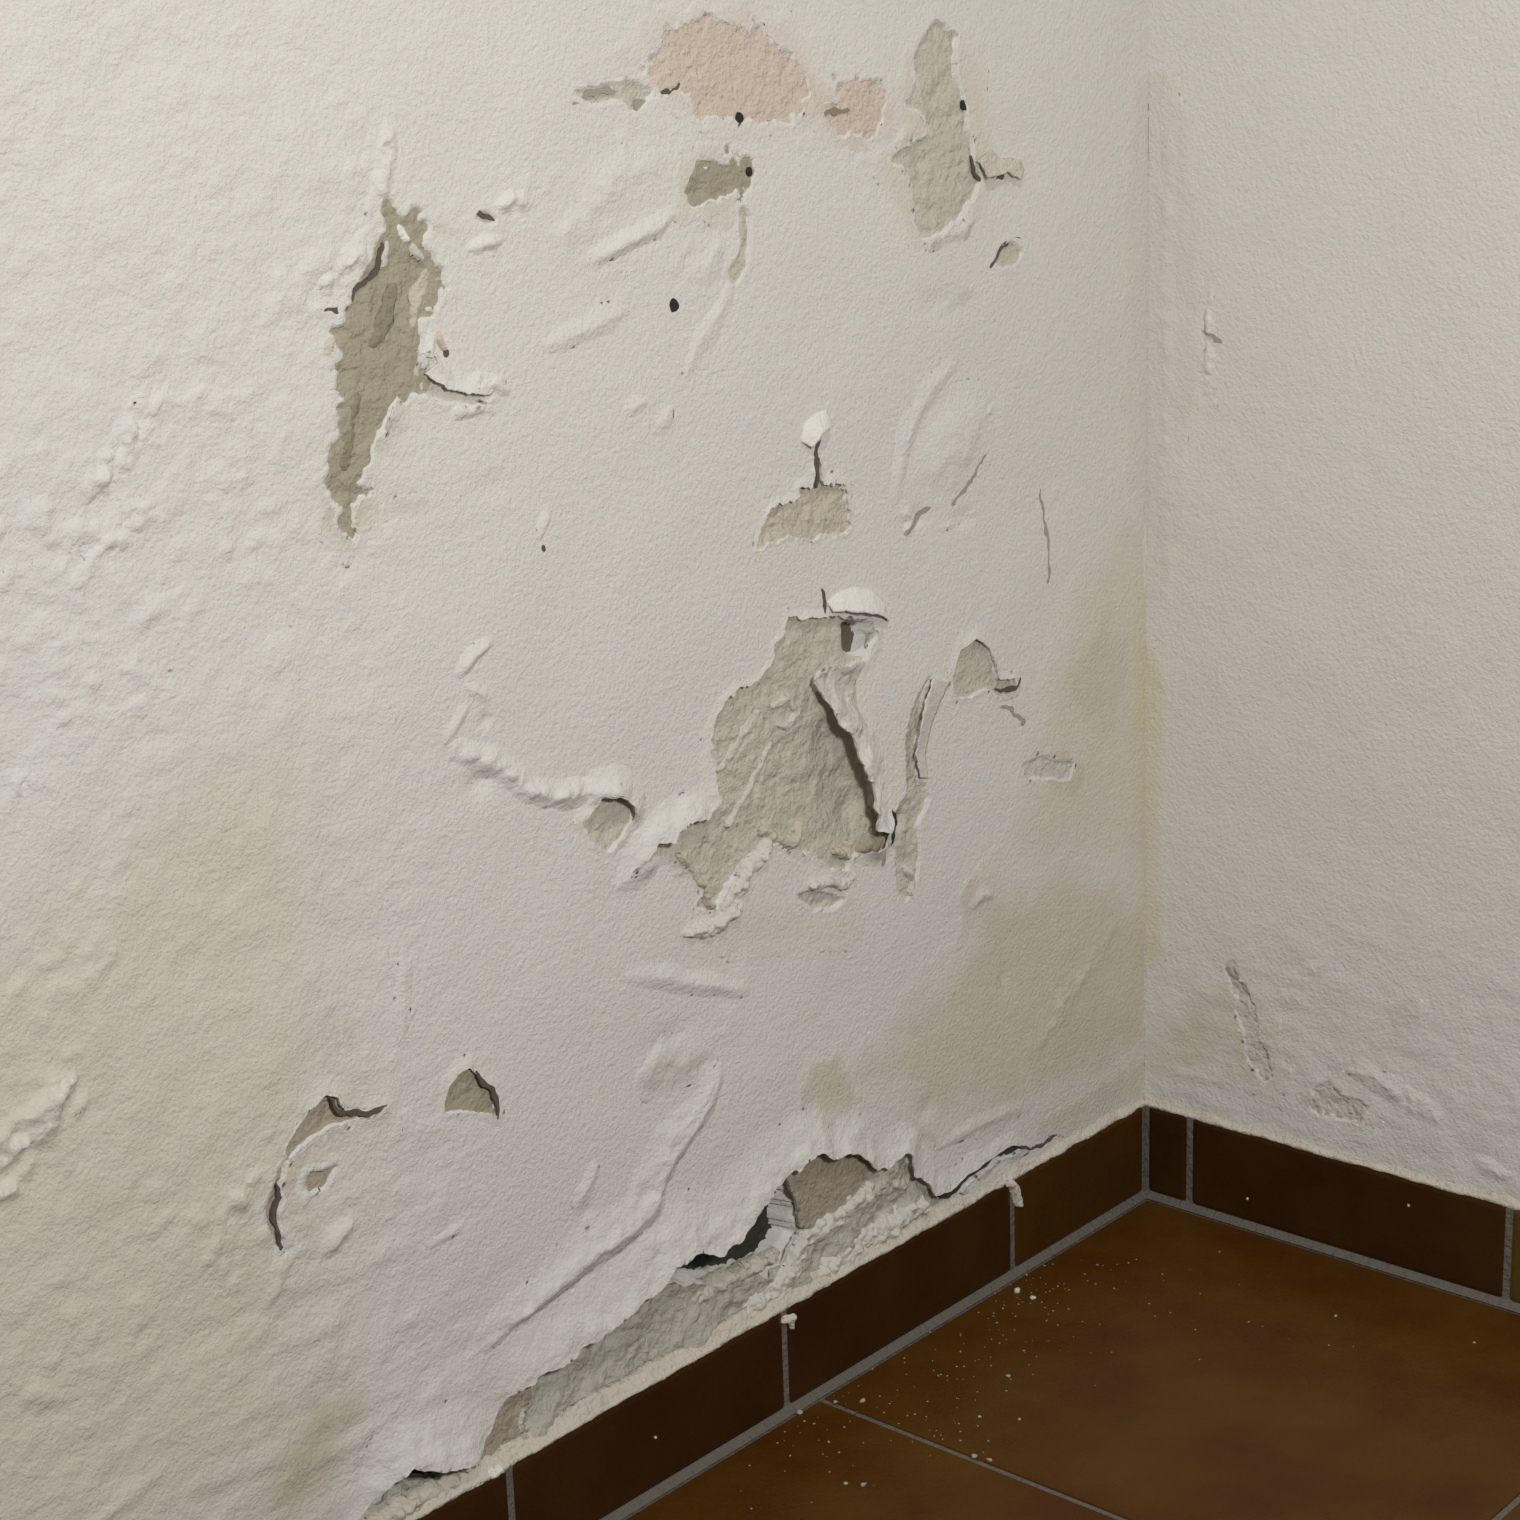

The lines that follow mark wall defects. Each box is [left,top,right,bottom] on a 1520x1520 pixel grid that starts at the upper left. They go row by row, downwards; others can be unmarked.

peeling [575,15,809,124]
peeling [824,75,886,140]
peeling [892,21,1024,238]
peeling [324,199,499,539]
peeling [751,410,855,561]
peeling [573,587,1021,918]
peeling [436,1051,505,1126]
peeling [266,1092,387,1244]
peeling [347,1108,1031,1520]